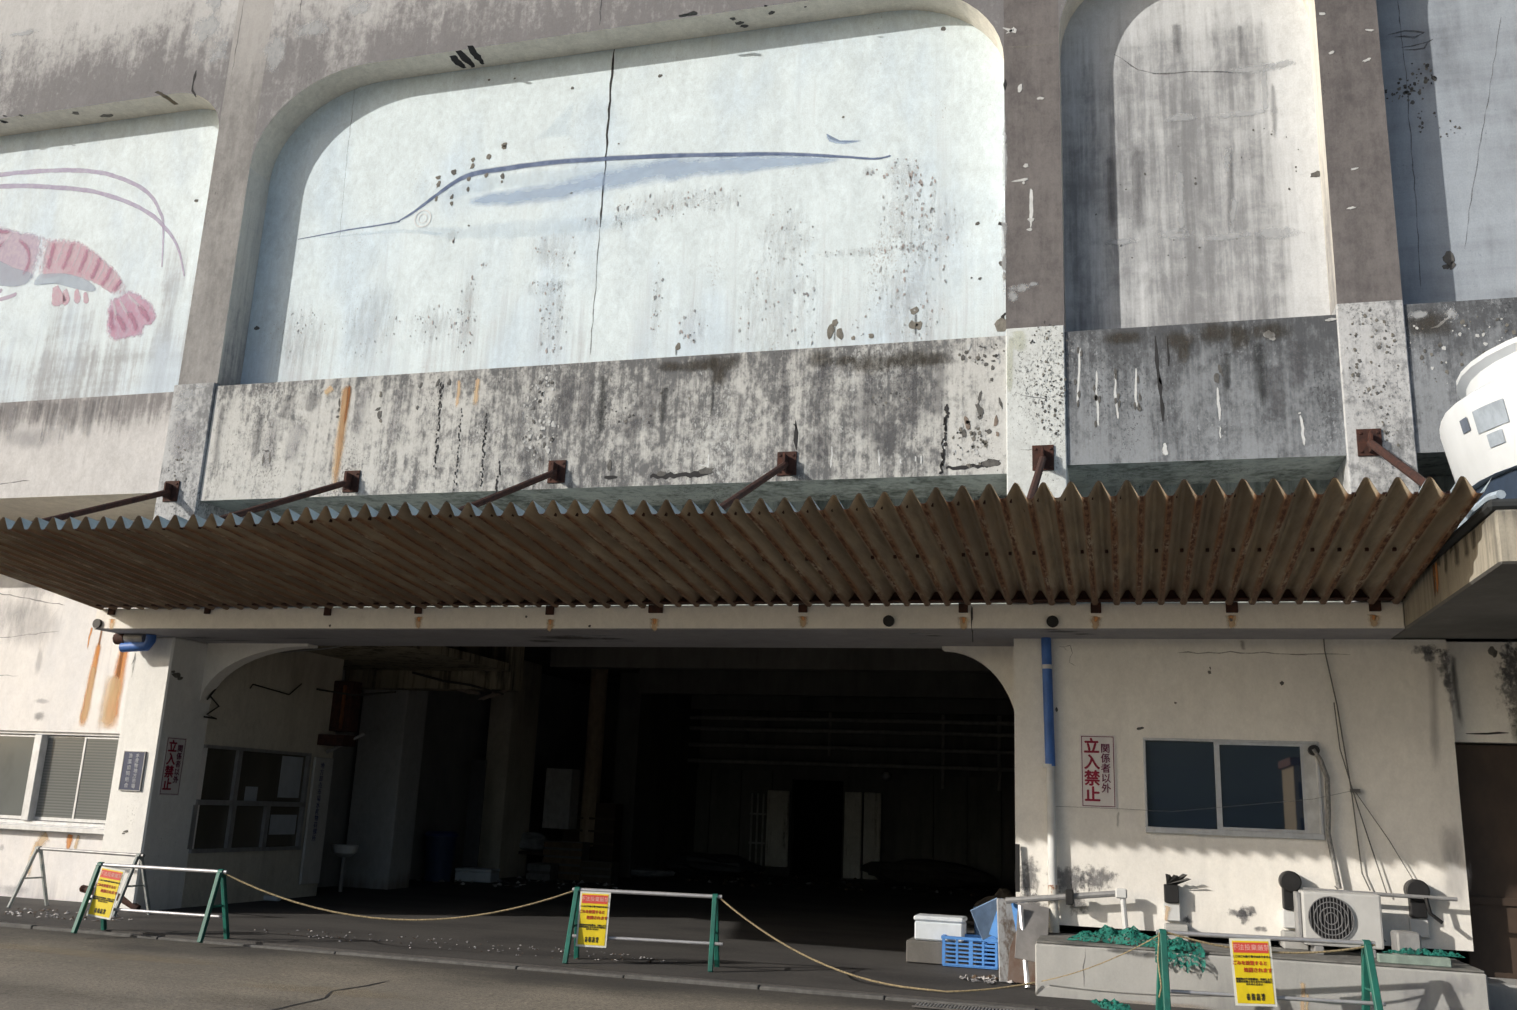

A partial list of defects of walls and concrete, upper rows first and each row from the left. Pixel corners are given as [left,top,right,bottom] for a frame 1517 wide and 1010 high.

crack [590,0,615,354]
corrosion [325,386,351,479]
corrosion [80,619,127,724]
leakage [1436,649,1460,717]
mould [1502,642,1517,712]